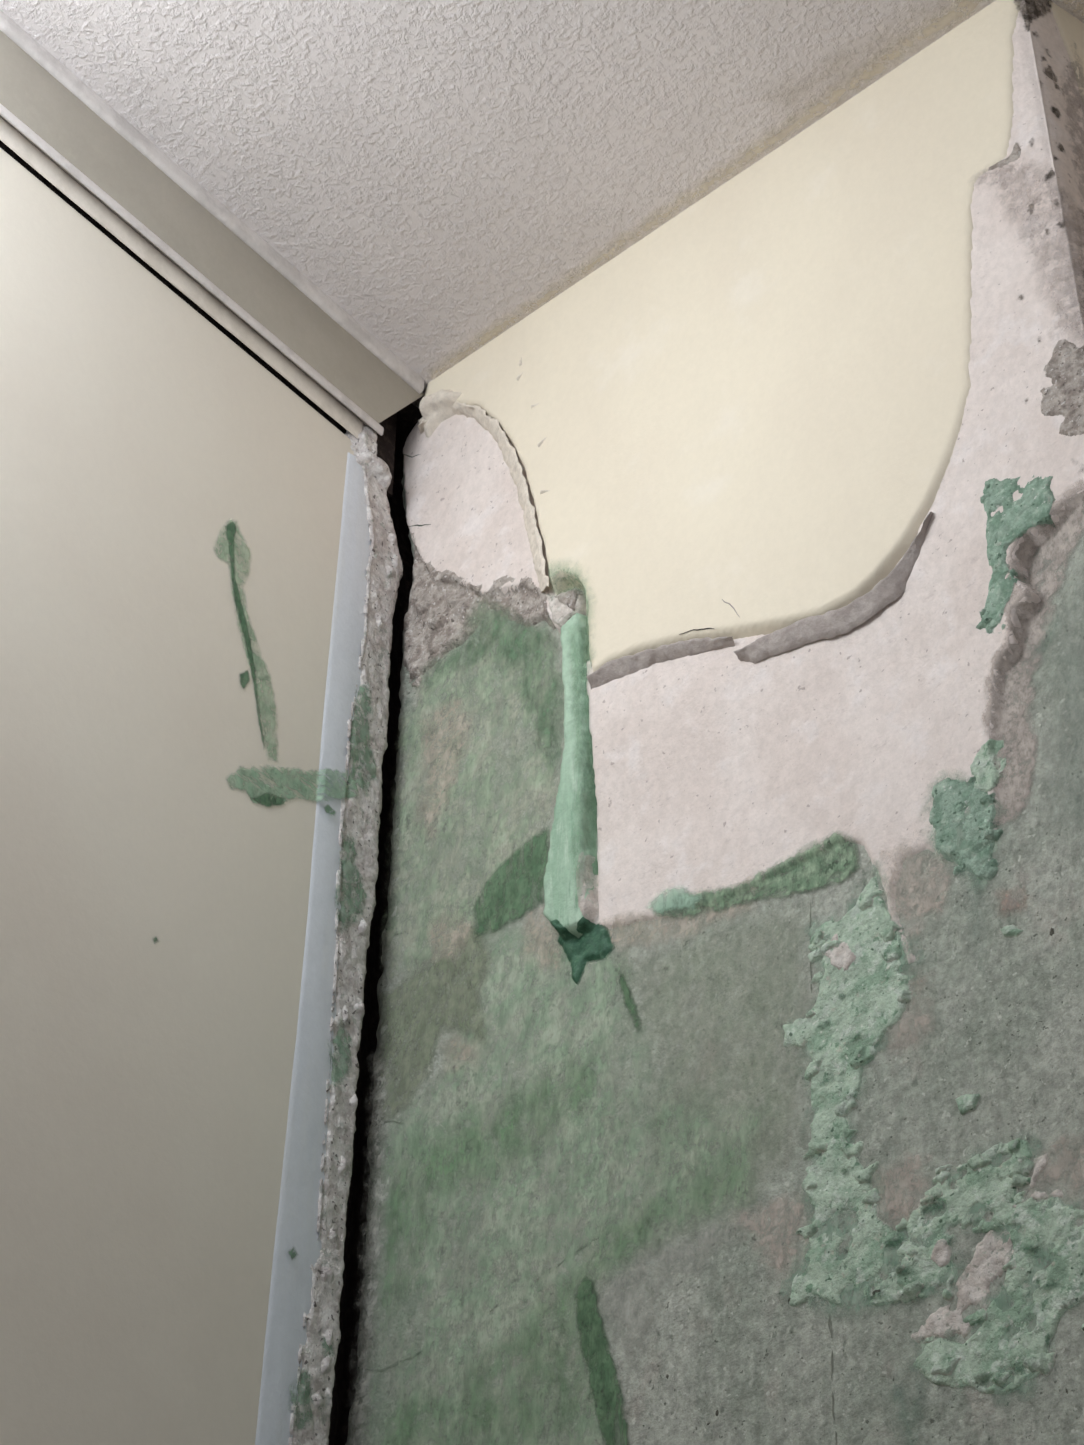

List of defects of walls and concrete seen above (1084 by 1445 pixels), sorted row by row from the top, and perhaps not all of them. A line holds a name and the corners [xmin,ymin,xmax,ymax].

crack [328,403,434,1445]
peeling [403,0,1084,1396]
water stain [982,480,1084,823]